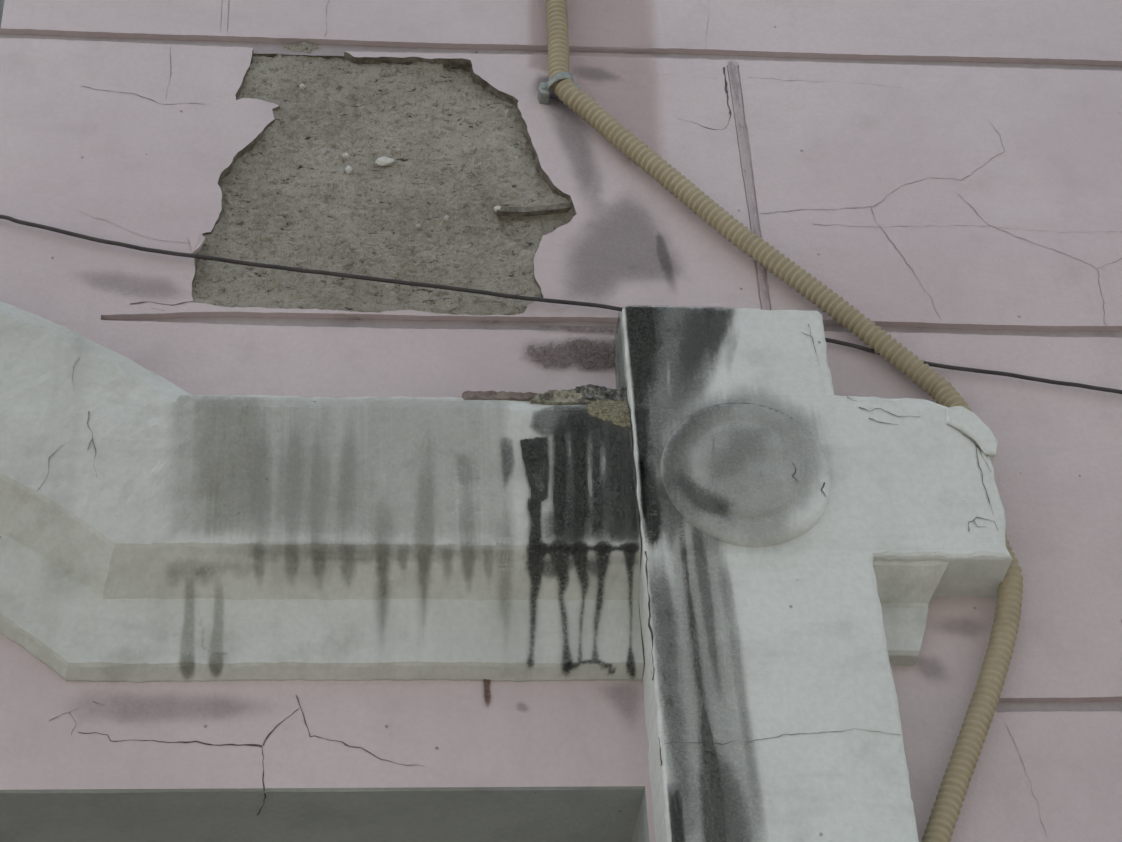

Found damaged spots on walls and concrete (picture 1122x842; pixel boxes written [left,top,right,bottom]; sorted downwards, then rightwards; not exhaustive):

flaking render [189,41,577,323]
crack [760,121,1122,323]
spalling [462,384,627,405]
water stain [502,306,747,842]
crack [49,695,421,816]